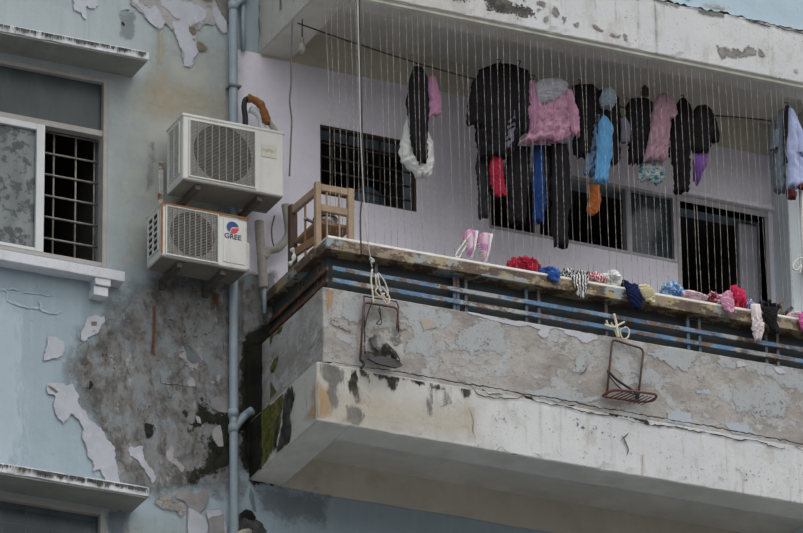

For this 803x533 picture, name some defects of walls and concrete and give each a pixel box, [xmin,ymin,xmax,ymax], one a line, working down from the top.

leakage [0,24,147,56]
peeling [120,0,227,68]
peeling [81,315,105,341]
peeling [399,303,598,376]
peeling [46,382,120,482]
leakage [0,273,275,497]
peeling [128,446,156,483]
leakage [273,386,295,453]
leakage [320,364,449,425]
crack [308,330,803,454]
peeling [633,346,803,437]
spalling [239,489,267,533]